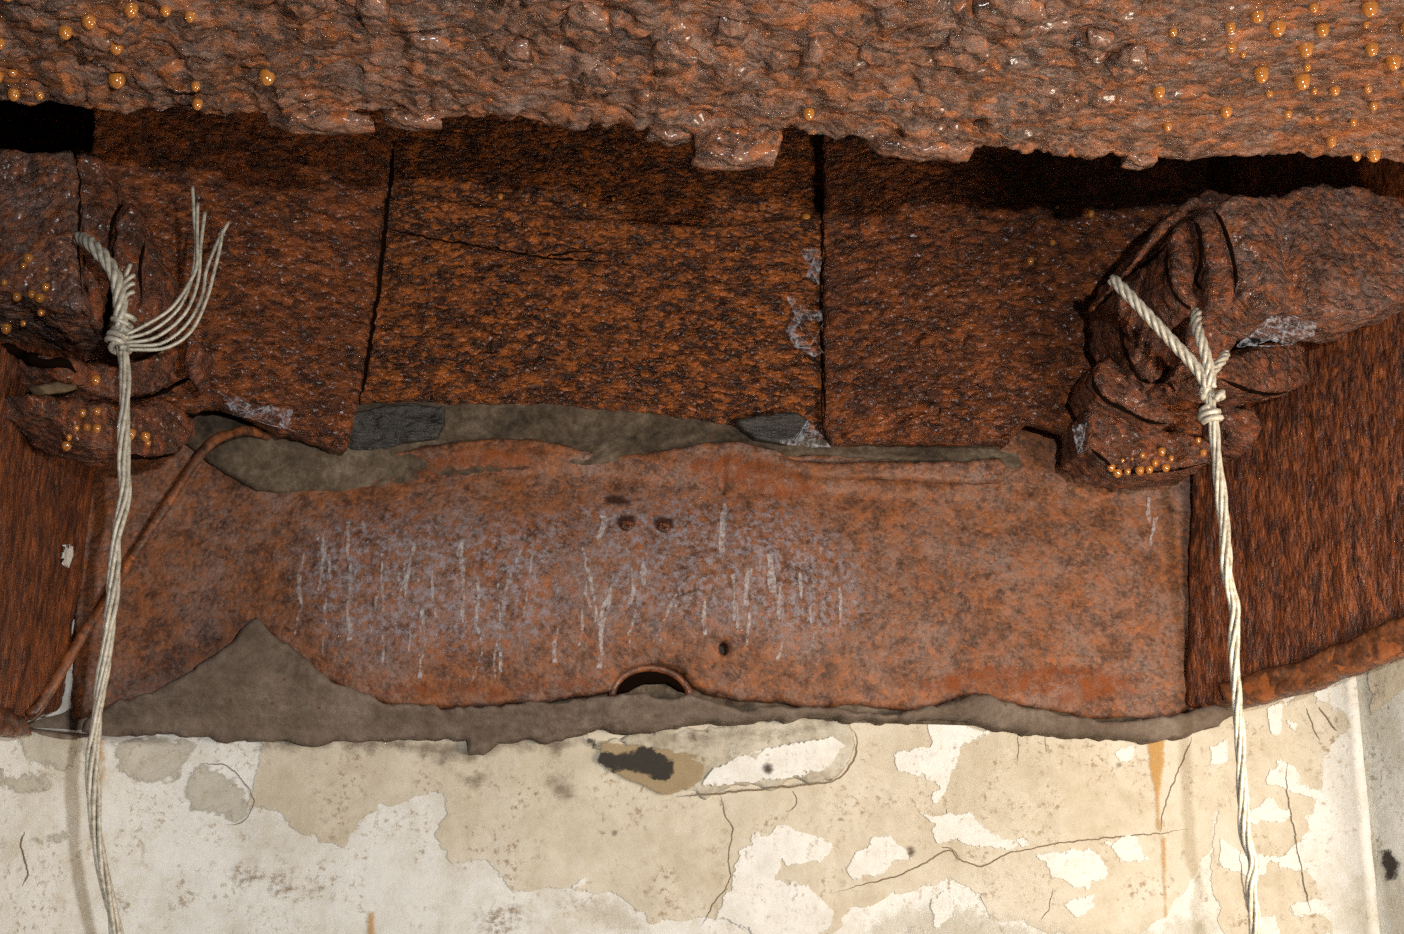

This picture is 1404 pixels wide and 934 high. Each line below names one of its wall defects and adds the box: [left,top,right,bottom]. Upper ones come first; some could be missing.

rust [931,0,1047,74]
rust [266,105,442,137]
rust [645,126,783,172]
rust [865,133,975,163]
rust [1120,152,1158,171]
peeling [0,706,88,794]
rust [1149,740,1164,802]
crack [1306,707,1337,740]
peeling [112,688,1351,934]
crack [677,726,858,926]
crack [835,742,1191,893]
crack [1286,763,1311,913]